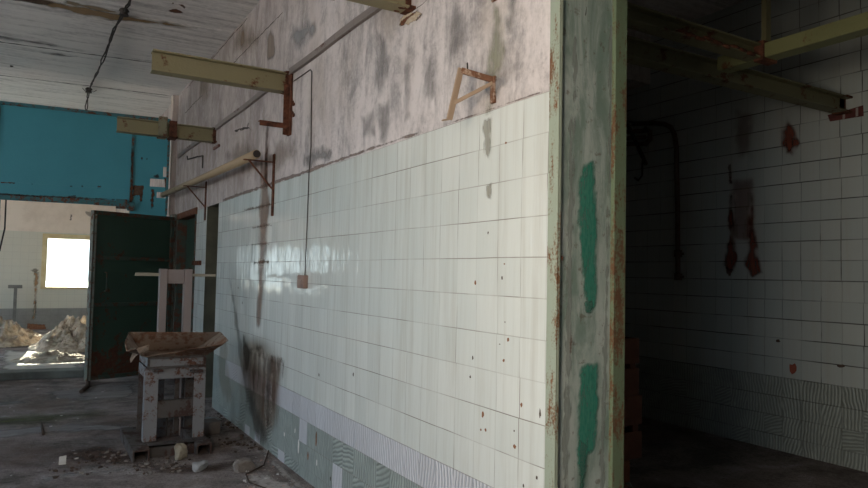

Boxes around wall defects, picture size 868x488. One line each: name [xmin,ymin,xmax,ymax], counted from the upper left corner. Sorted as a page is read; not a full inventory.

damp [15,0,184,27]
damp [236,29,275,60]
damp [377,40,388,88]
damp [486,8,511,94]
damp [483,119,491,156]
corrosion [782,123,799,153]
corrosion [0,182,115,200]
corrosion [130,151,155,208]
peeling [578,162,597,313]
corrosion [724,206,761,277]
peeling [577,363,598,488]